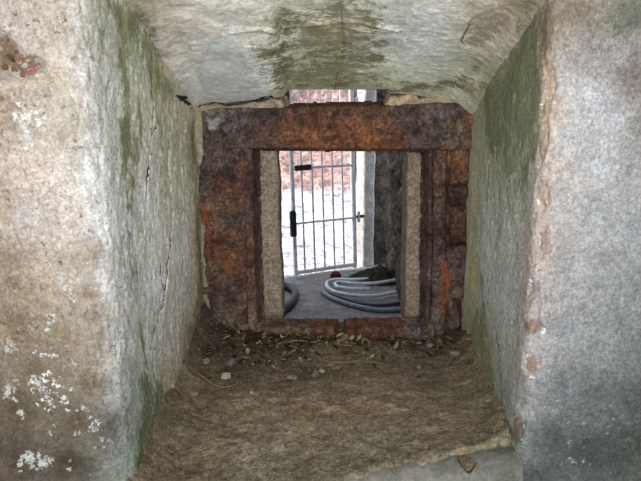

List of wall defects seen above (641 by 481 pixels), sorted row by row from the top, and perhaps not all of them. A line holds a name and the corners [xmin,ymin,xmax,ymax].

leakage [118,42,131,154]
leakage [271,13,304,91]
crack [150,215,172,379]